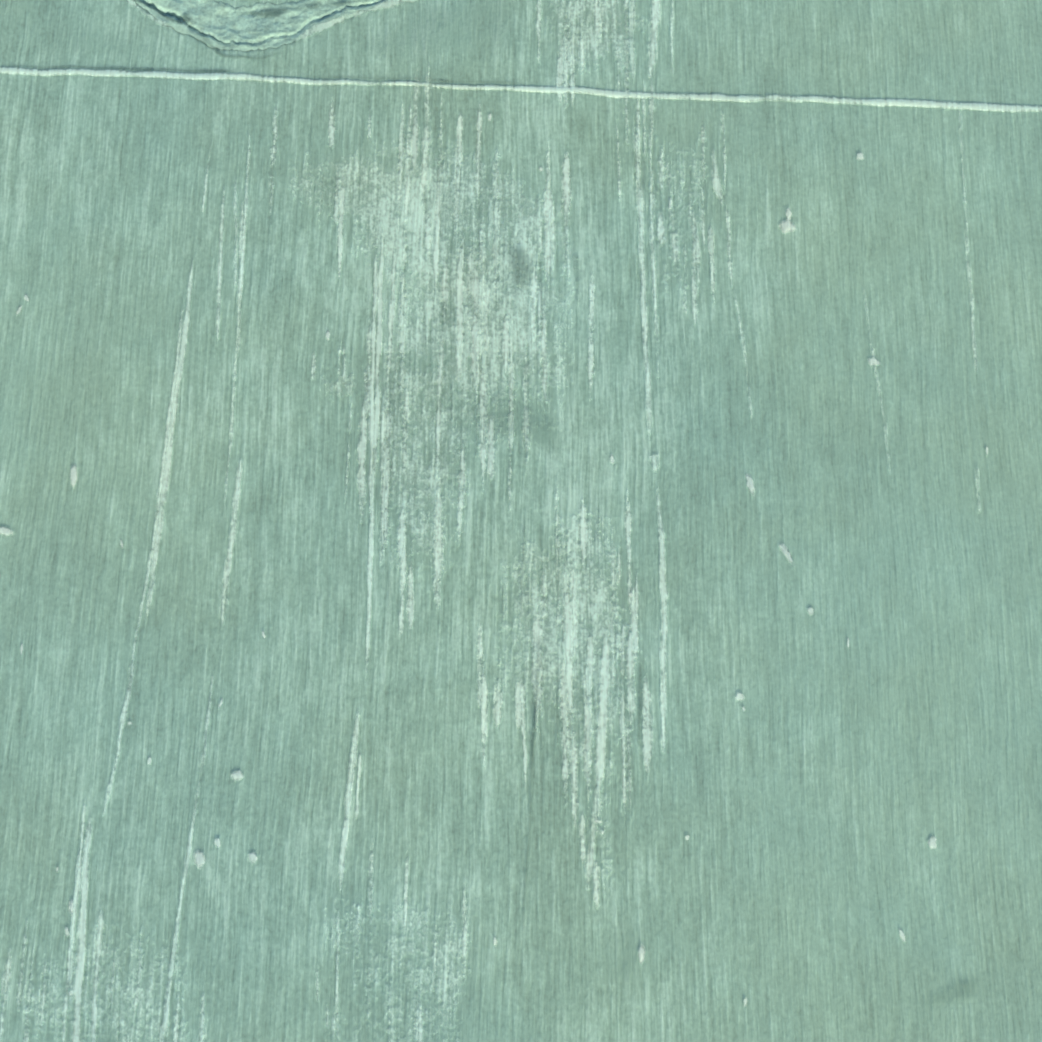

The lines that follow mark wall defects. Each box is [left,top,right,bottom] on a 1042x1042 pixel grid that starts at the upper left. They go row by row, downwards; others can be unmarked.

crack [128,0,417,51]